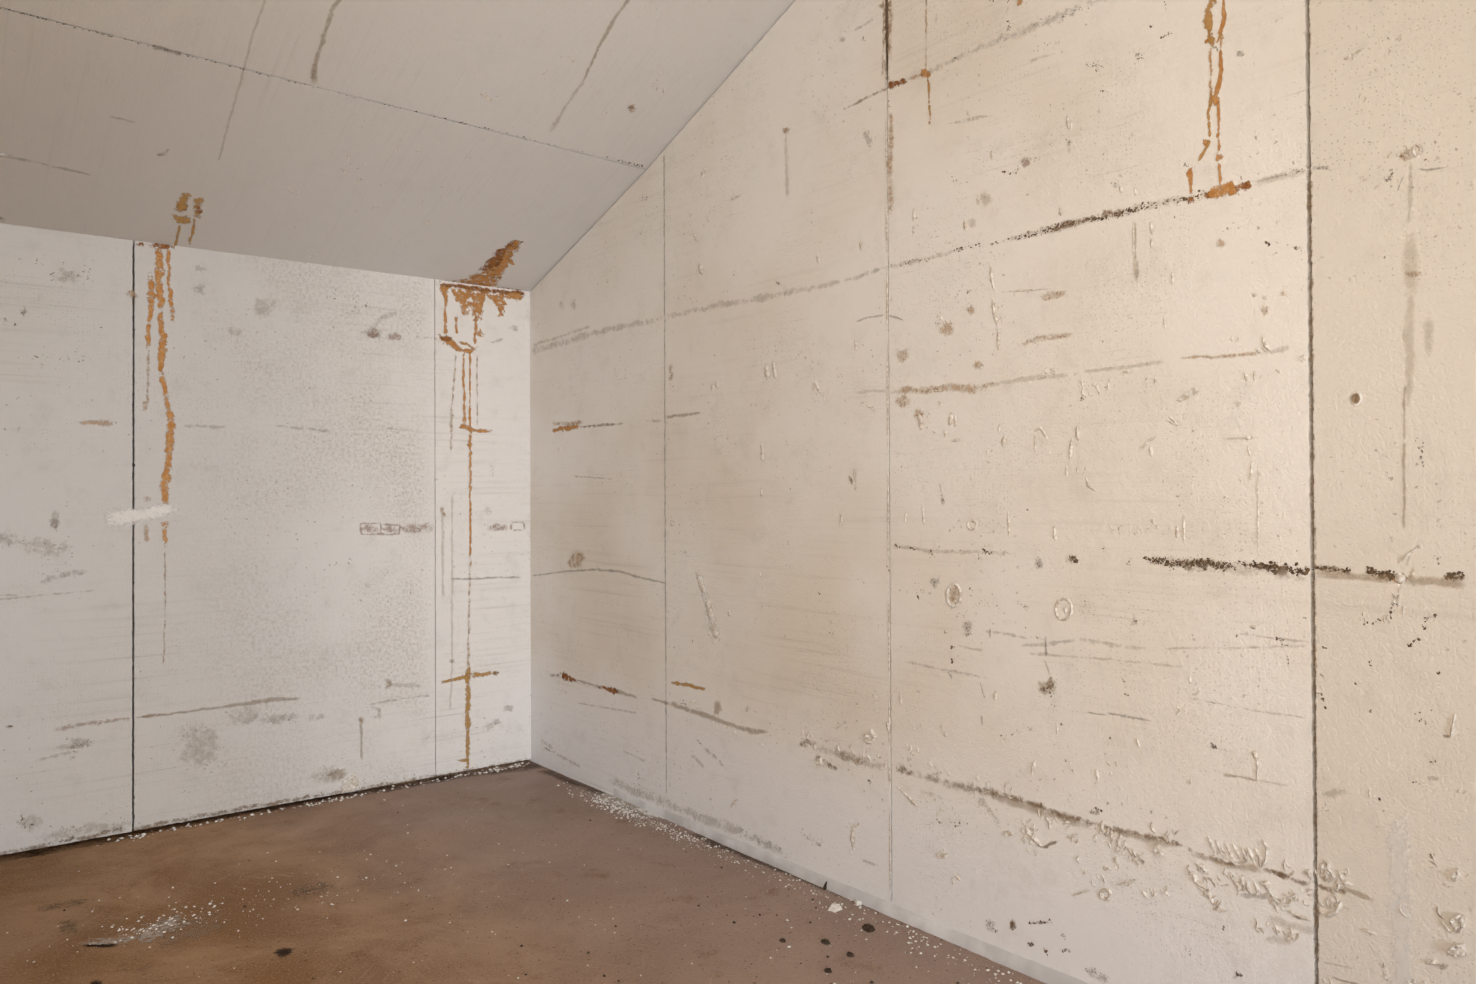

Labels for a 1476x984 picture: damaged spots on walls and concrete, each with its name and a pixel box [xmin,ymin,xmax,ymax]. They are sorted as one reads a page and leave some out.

rust [1182,0,1252,204]
rust [129,193,204,602]
rust [436,240,524,768]
peeling [800,693,1355,943]
peeling [1381,907,1466,984]